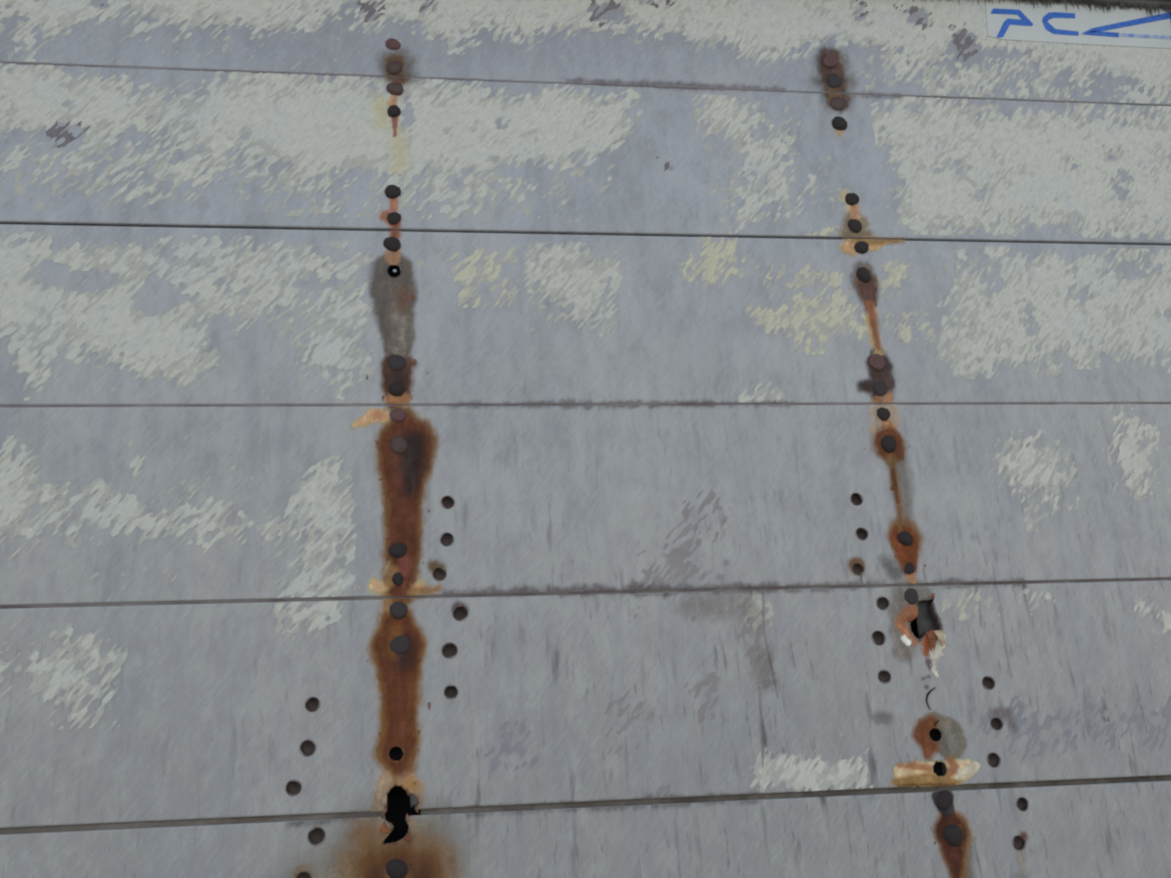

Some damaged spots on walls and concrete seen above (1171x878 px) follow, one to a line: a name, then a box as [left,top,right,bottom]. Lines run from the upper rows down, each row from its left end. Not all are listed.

rust [816,49,850,109]
peeling [0,0,1171,403]
leakage [371,250,416,356]
rust [839,190,946,688]
peeling [978,429,1086,532]
peeling [0,436,360,641]
rust [295,354,453,878]
peeling [0,614,128,730]
peeling [742,747,873,793]
peeling [893,758,980,787]
rust [913,713,966,759]
rust [932,791,972,878]